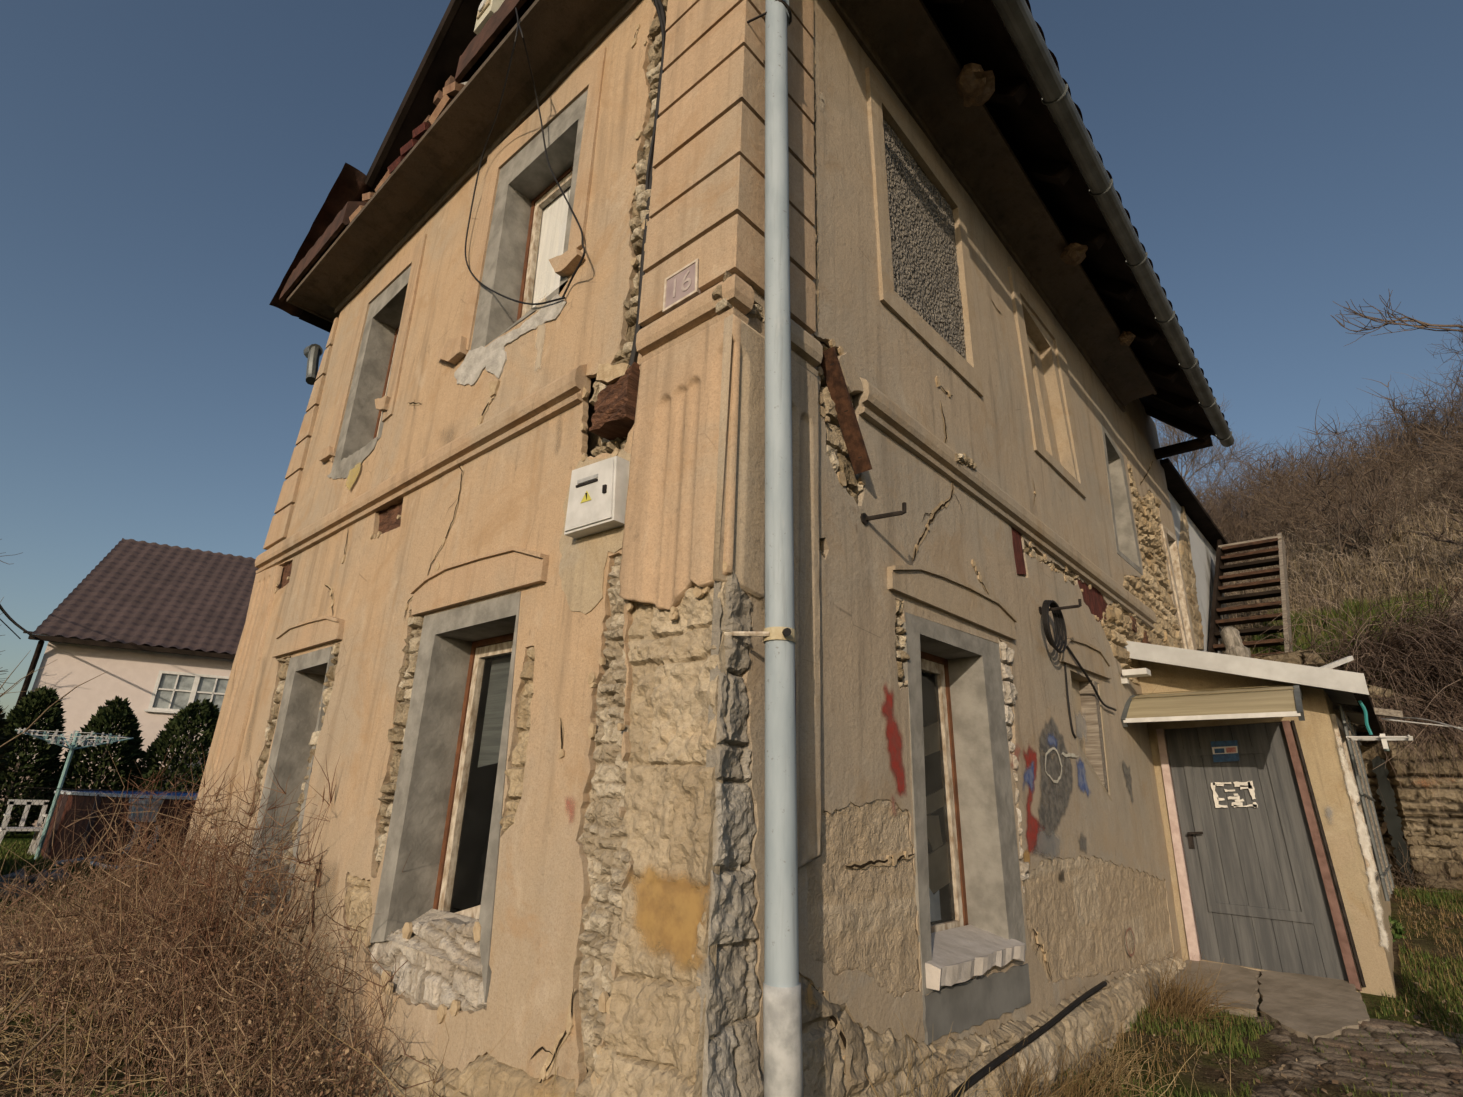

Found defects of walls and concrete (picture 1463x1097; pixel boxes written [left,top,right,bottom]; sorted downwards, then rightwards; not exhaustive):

peeling [454,294,567,397]
crack [475,395,495,427]
spalling [817,338,866,503]
crack [935,376,953,444]
crack [403,465,464,620]
crack [912,482,961,562]
spalling [1023,541,1092,592]
spalling [1094,462,1204,686]
spalling [895,599,910,688]
spalling [262,561,764,1097]
spalling [799,641,1186,1097]